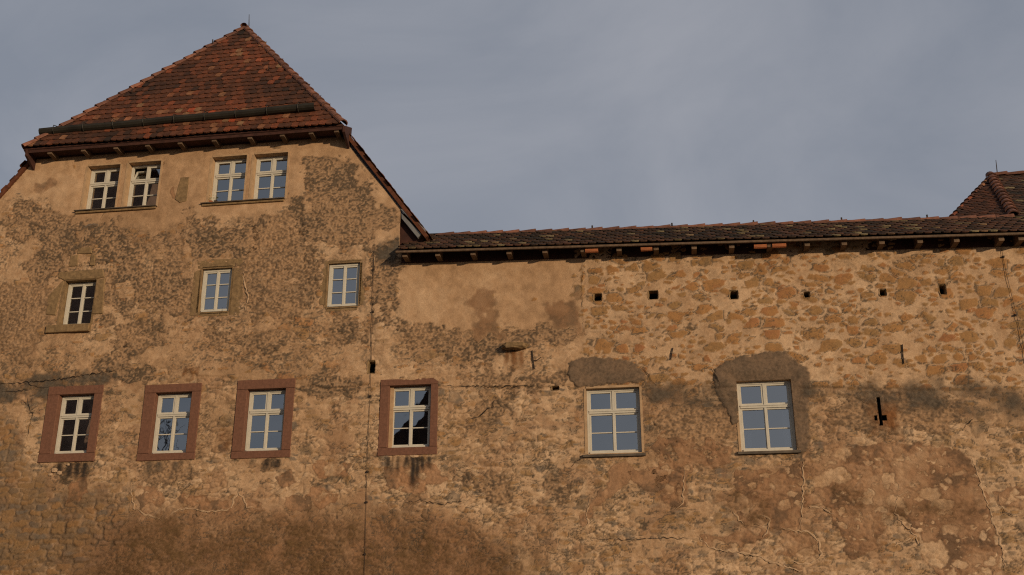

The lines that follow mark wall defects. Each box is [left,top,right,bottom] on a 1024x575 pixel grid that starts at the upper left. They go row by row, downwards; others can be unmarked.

spalling [0,155,585,431]
damp [405,457,431,484]
crack [594,534,687,542]